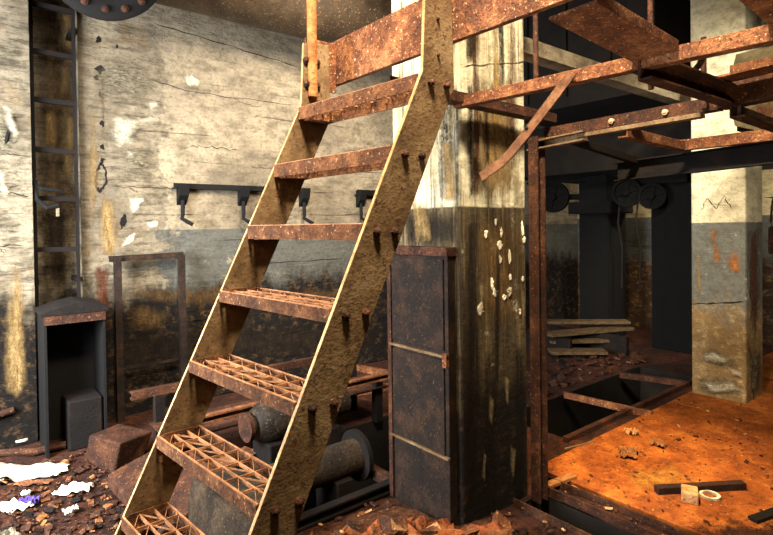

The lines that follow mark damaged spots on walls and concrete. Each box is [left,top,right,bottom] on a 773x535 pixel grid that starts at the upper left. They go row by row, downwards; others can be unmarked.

crack [157,24,297,67]
water stain [488,27,505,83]
crack [155,81,289,107]
peeling [484,219,511,264]
water stain [5,273,25,395]
water stain [407,105,524,516]
peeling [490,274,524,300]
corrosion [749,232,759,330]